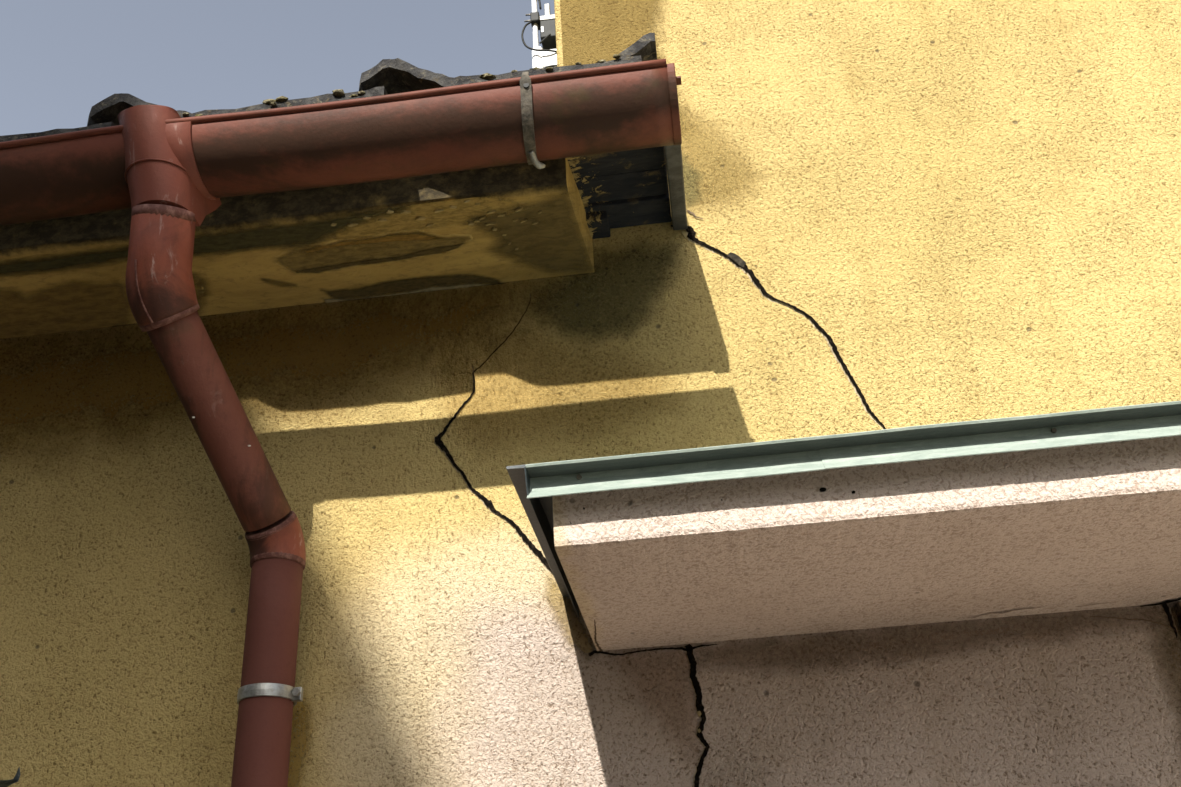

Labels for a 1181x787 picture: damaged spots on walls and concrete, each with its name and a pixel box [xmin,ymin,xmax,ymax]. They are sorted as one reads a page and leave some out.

water stain [0,282,130,340]
crack [671,209,888,429]
crack [434,293,553,575]
crack [589,620,717,787]